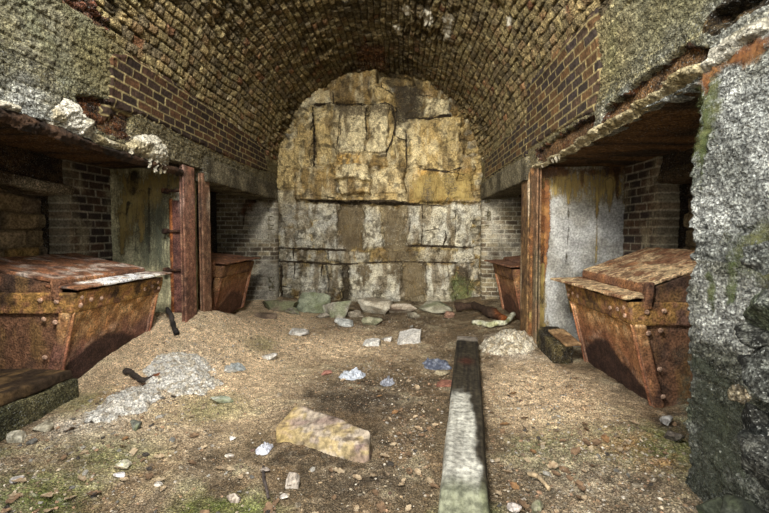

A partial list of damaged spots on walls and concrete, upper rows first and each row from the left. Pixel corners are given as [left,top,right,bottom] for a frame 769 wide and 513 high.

efflorescence [402,3,454,40]
spalling [702,0,769,36]
rust [0,107,184,176]
crack [308,83,462,174]
peeling [484,8,710,179]
damp [118,170,162,265]
rust [529,166,625,285]